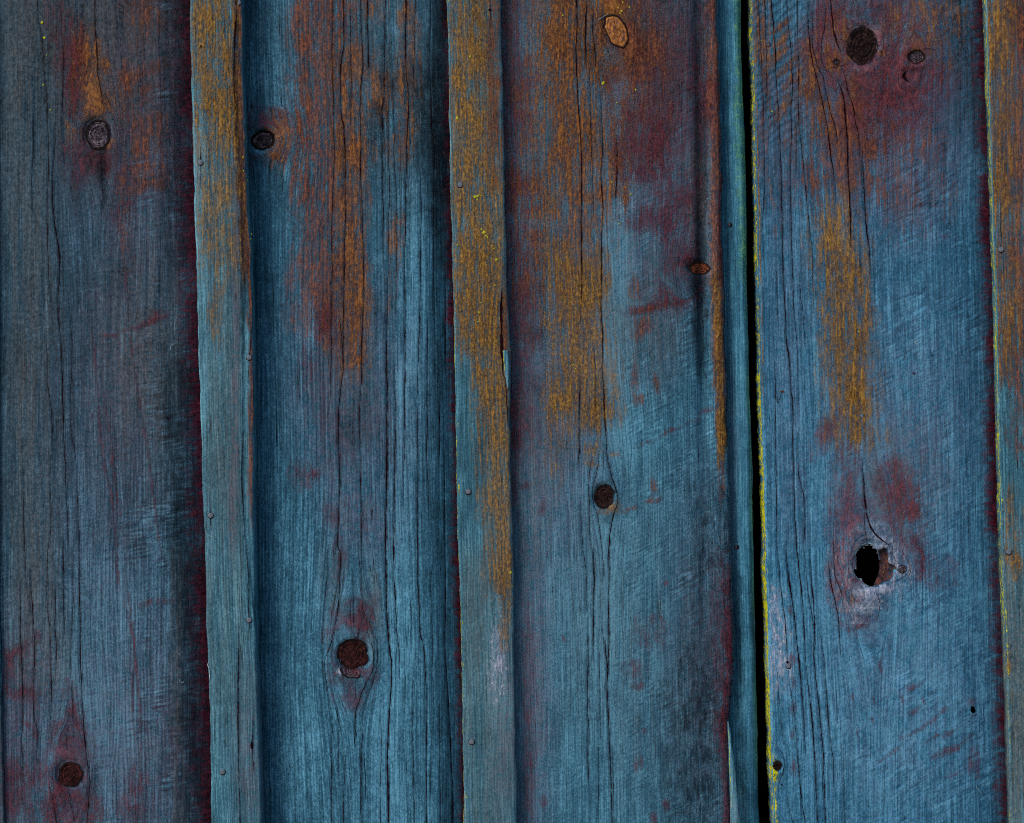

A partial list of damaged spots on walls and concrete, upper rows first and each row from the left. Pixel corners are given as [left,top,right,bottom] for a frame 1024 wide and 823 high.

crack [758,0,884,823]
crack [862,459,911,622]